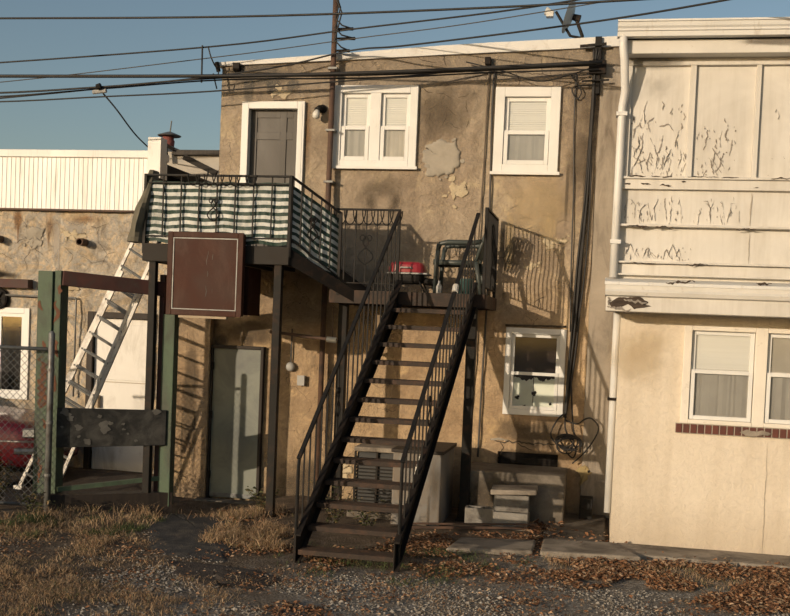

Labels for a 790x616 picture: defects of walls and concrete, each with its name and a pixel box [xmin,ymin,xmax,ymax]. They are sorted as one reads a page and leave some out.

peeling [625,101,739,187]
peeling [439,175,468,209]
peeling [624,197,683,228]
peeling [624,244,707,266]